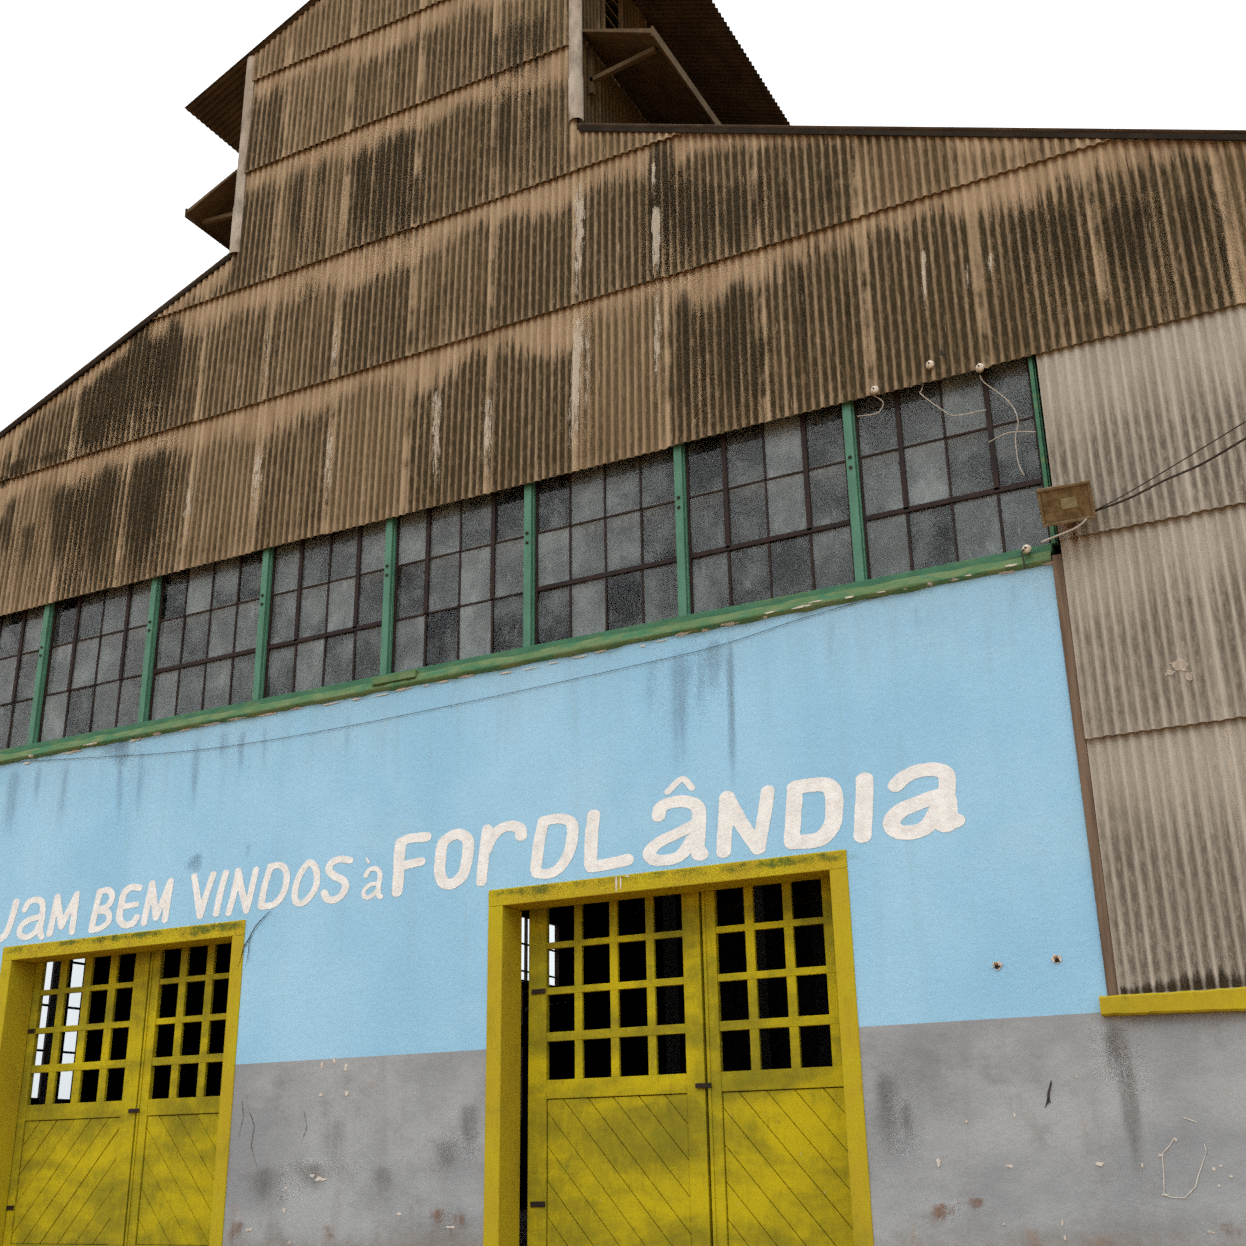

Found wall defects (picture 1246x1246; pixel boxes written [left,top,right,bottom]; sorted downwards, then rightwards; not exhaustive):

water stain [488,17,547,83]
water stain [290,162,326,241]
water stain [354,132,419,250]
efflorescence [574,189,585,285]
water stain [648,140,761,273]
water stain [1103,201,1149,292]
water stain [78,319,183,447]
water stain [432,394,441,474]
efflorescence [570,316,589,444]
water stain [720,280,765,401]
water stain [51,450,166,573]
peeling [1165,657,1193,681]